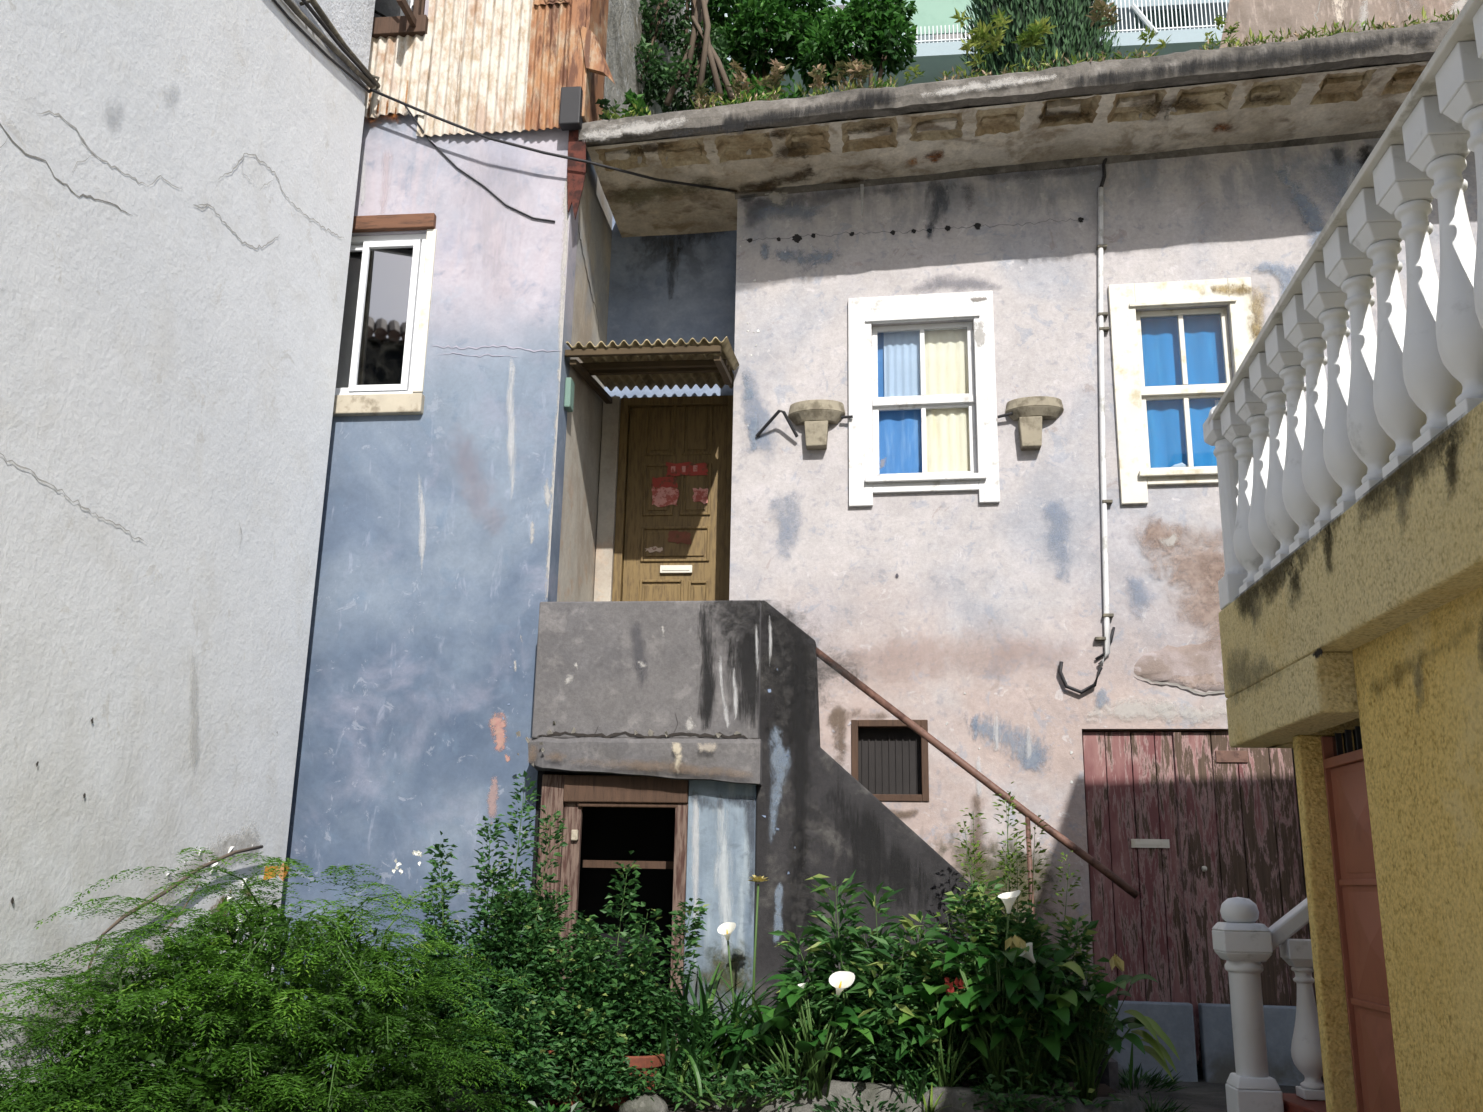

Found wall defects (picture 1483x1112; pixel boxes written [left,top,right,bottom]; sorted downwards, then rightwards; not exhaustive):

crack [0,110,344,250]
leakage [731,143,817,194]
leakage [927,184,948,238]
crack [0,453,144,541]
leakage [1359,416,1462,518]
leakage [1236,514,1341,616]
leakage [699,611,760,751]
peeling [488,779,499,824]
leakage [785,640,812,974]
peeling [972,716,1045,793]